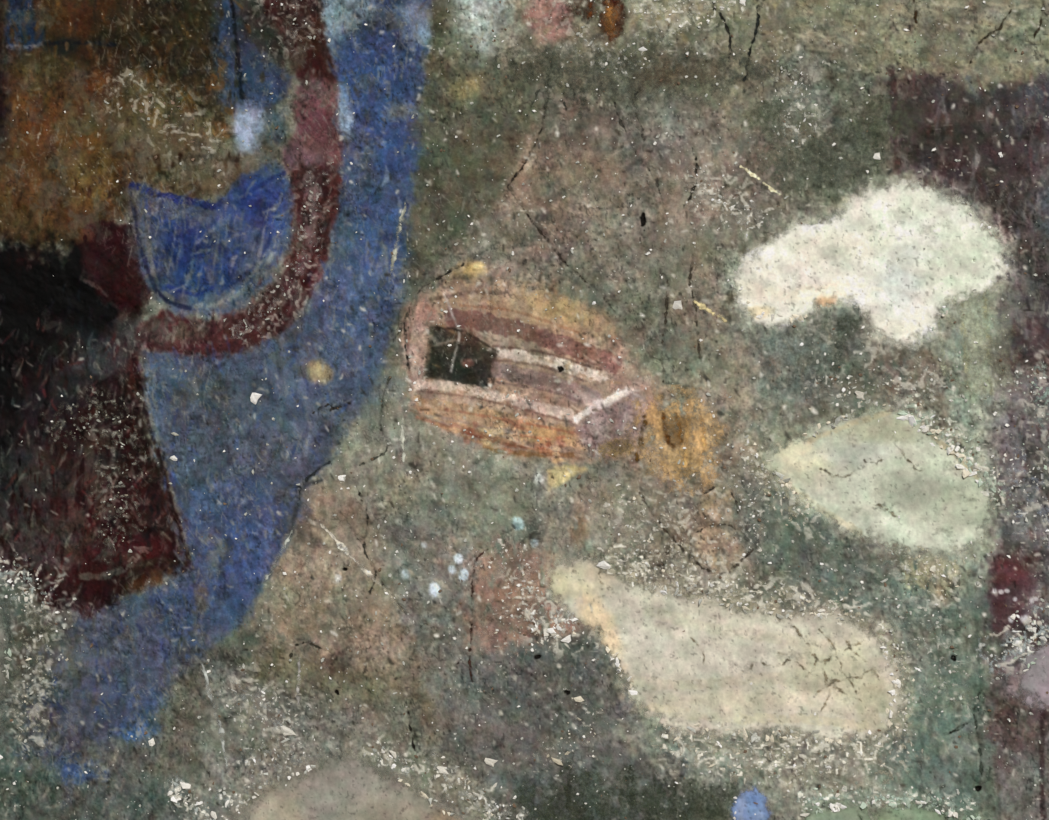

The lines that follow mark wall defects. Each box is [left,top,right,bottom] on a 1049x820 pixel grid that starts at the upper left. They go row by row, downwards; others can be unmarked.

crack [713,6,760,81]
crack [507,89,612,308]
crack [298,461,331,499]
spalling [728,366,1049,600]
spalling [0,556,55,741]
spalling [477,484,990,820]